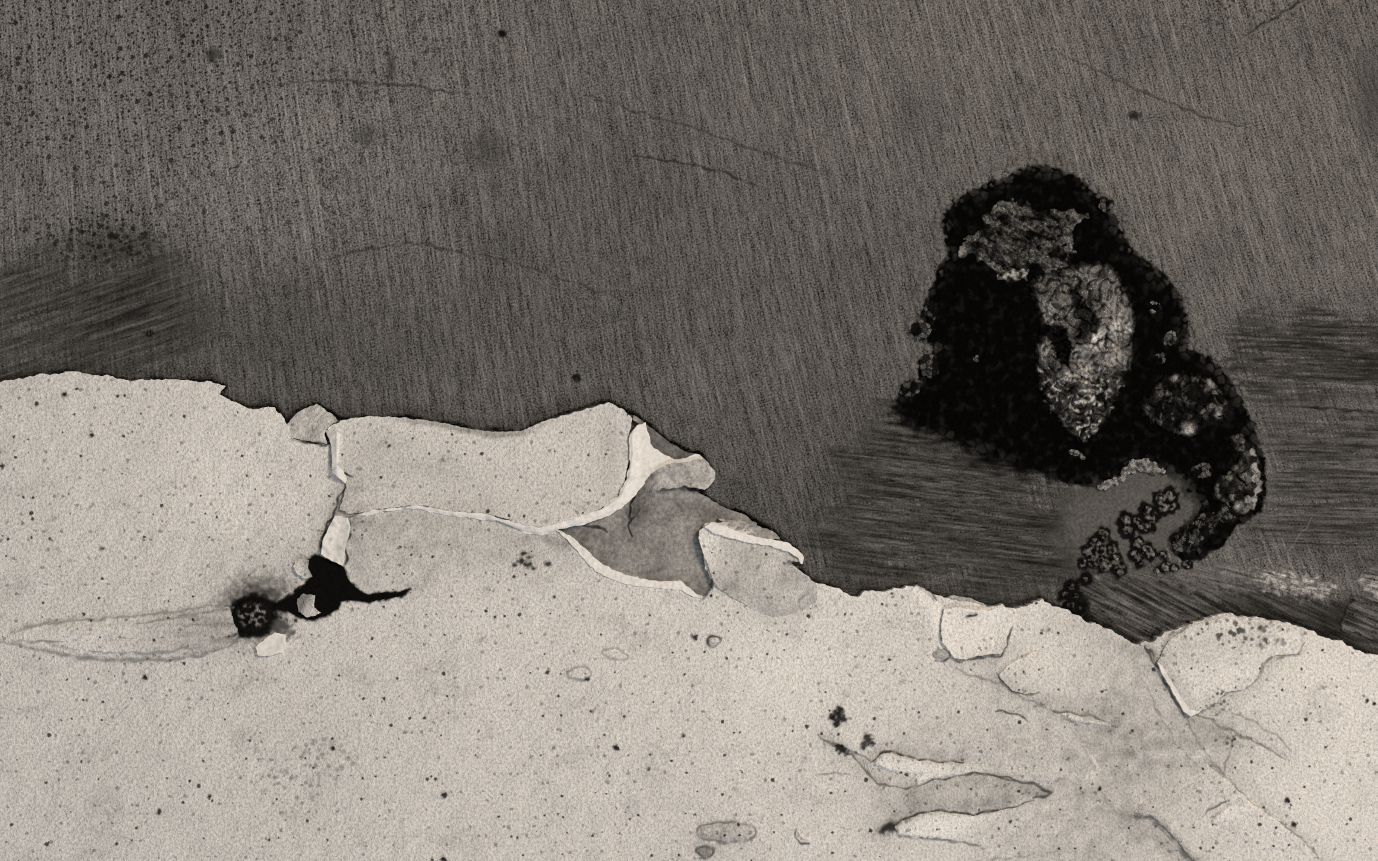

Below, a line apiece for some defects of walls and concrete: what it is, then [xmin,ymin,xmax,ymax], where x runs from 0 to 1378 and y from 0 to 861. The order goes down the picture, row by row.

rust [892,154,1271,620]
peeling [287,402,818,617]
rust [230,583,295,656]
peeling [909,583,1052,695]
crack [1199,716,1282,772]